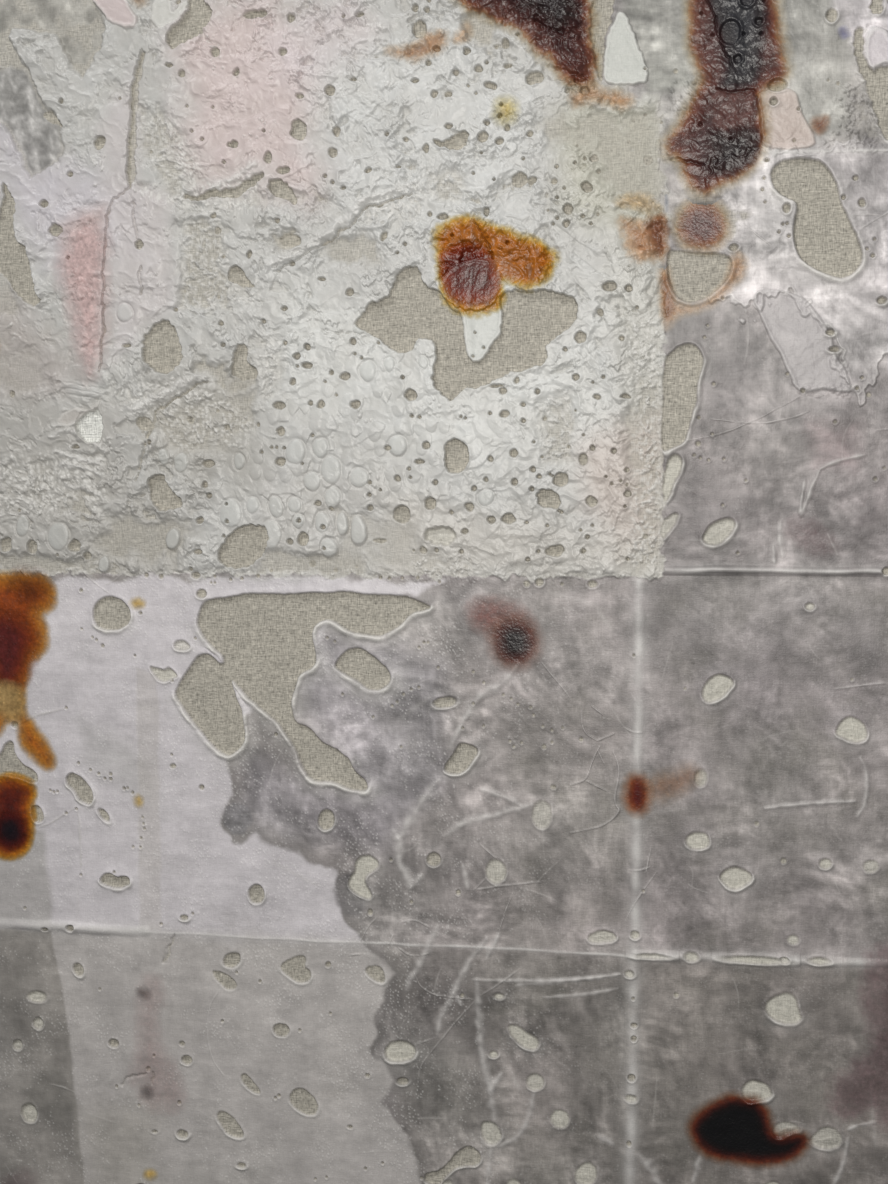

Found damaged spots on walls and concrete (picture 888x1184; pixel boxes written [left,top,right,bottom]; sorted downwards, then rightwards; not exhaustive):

spalling [0,180,44,309]
crack [97,48,145,373]
spalling [351,262,582,405]
rust [434,215,556,316]
rust [621,196,691,321]
spalling [664,247,735,306]
rust [709,256,743,303]
spalling [762,89,867,283]
spalling [657,340,708,542]
rust [0,573,56,770]
spalling [148,587,434,796]
rust [0,773,37,860]